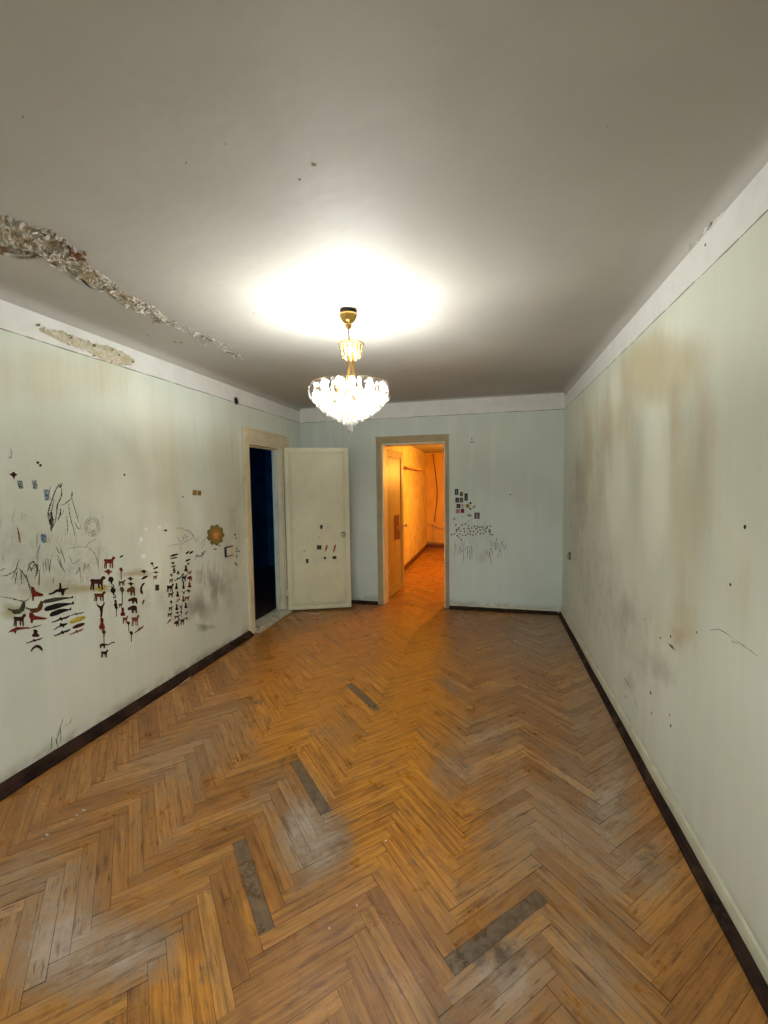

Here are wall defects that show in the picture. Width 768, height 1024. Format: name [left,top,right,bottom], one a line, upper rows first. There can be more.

spalling [0,215,245,366]
leakage [580,320,762,551]